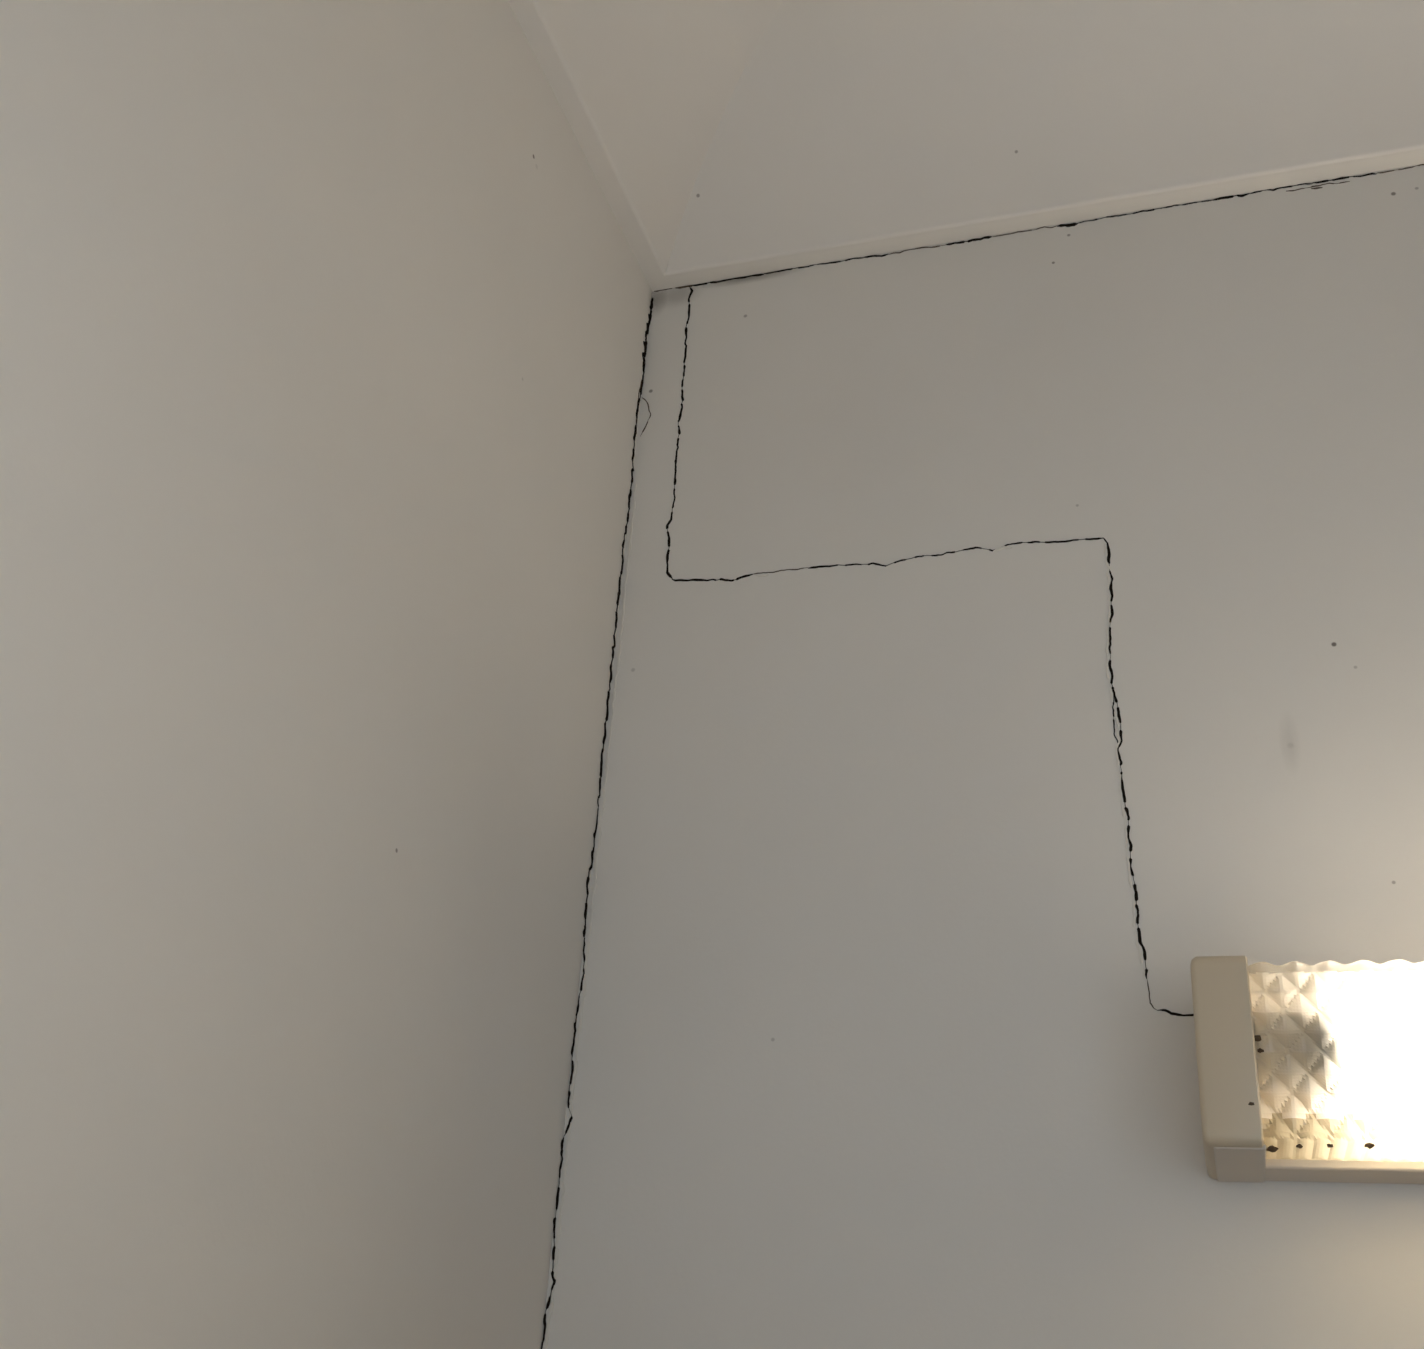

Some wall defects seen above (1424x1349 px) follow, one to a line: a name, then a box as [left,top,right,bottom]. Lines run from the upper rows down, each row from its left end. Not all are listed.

crack [541,164,1424,1349]